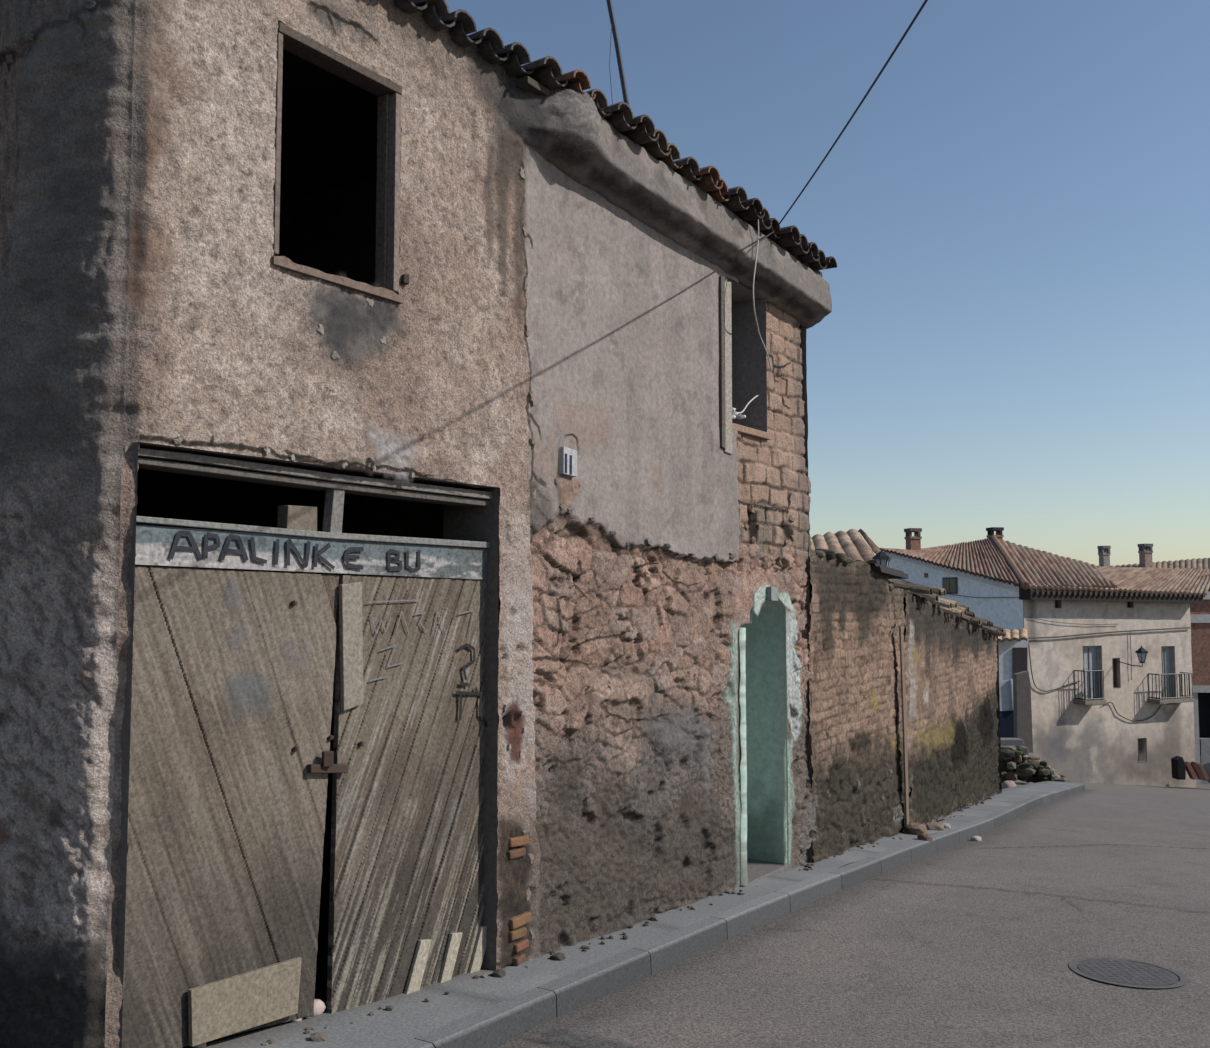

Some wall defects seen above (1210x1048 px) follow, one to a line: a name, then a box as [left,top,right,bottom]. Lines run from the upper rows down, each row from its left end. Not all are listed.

crack [310,1,381,45]
water stain [313,286,399,360]
peeling [530,475,737,564]
hole [502,703,526,761]
peeling [583,673,648,705]
peeling [725,624,741,888]
peeling [754,585,803,864]
water stain [908,691,1001,816]